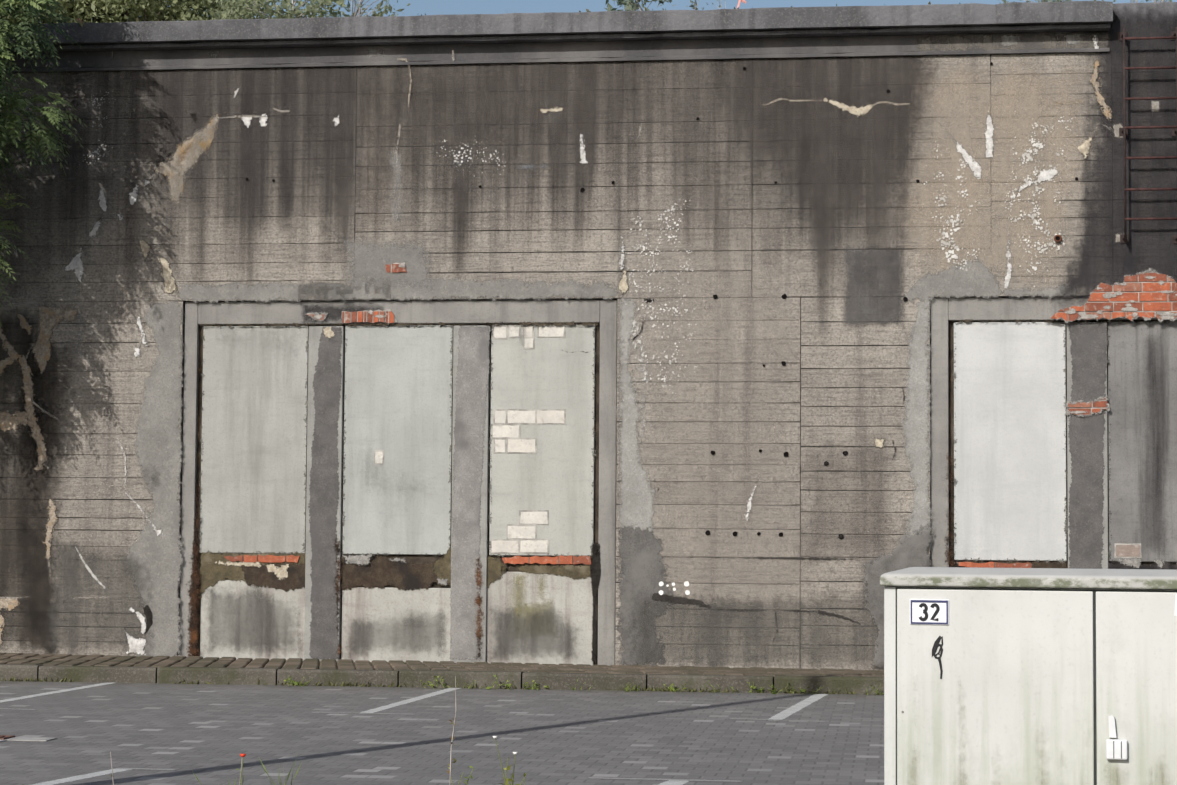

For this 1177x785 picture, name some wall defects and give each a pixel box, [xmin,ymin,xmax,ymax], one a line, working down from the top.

damp [62,51,596,257]
damp [618,34,1026,289]
damp [1037,12,1177,295]
peeling [65,248,84,284]
peeling [140,240,177,293]
peeling [2,302,78,374]
peeling [1050,268,1177,569]
spalling [0,597,20,644]
damp [235,593,277,652]
damp [351,622,371,652]
damp [497,614,571,656]
damp [694,602,778,667]